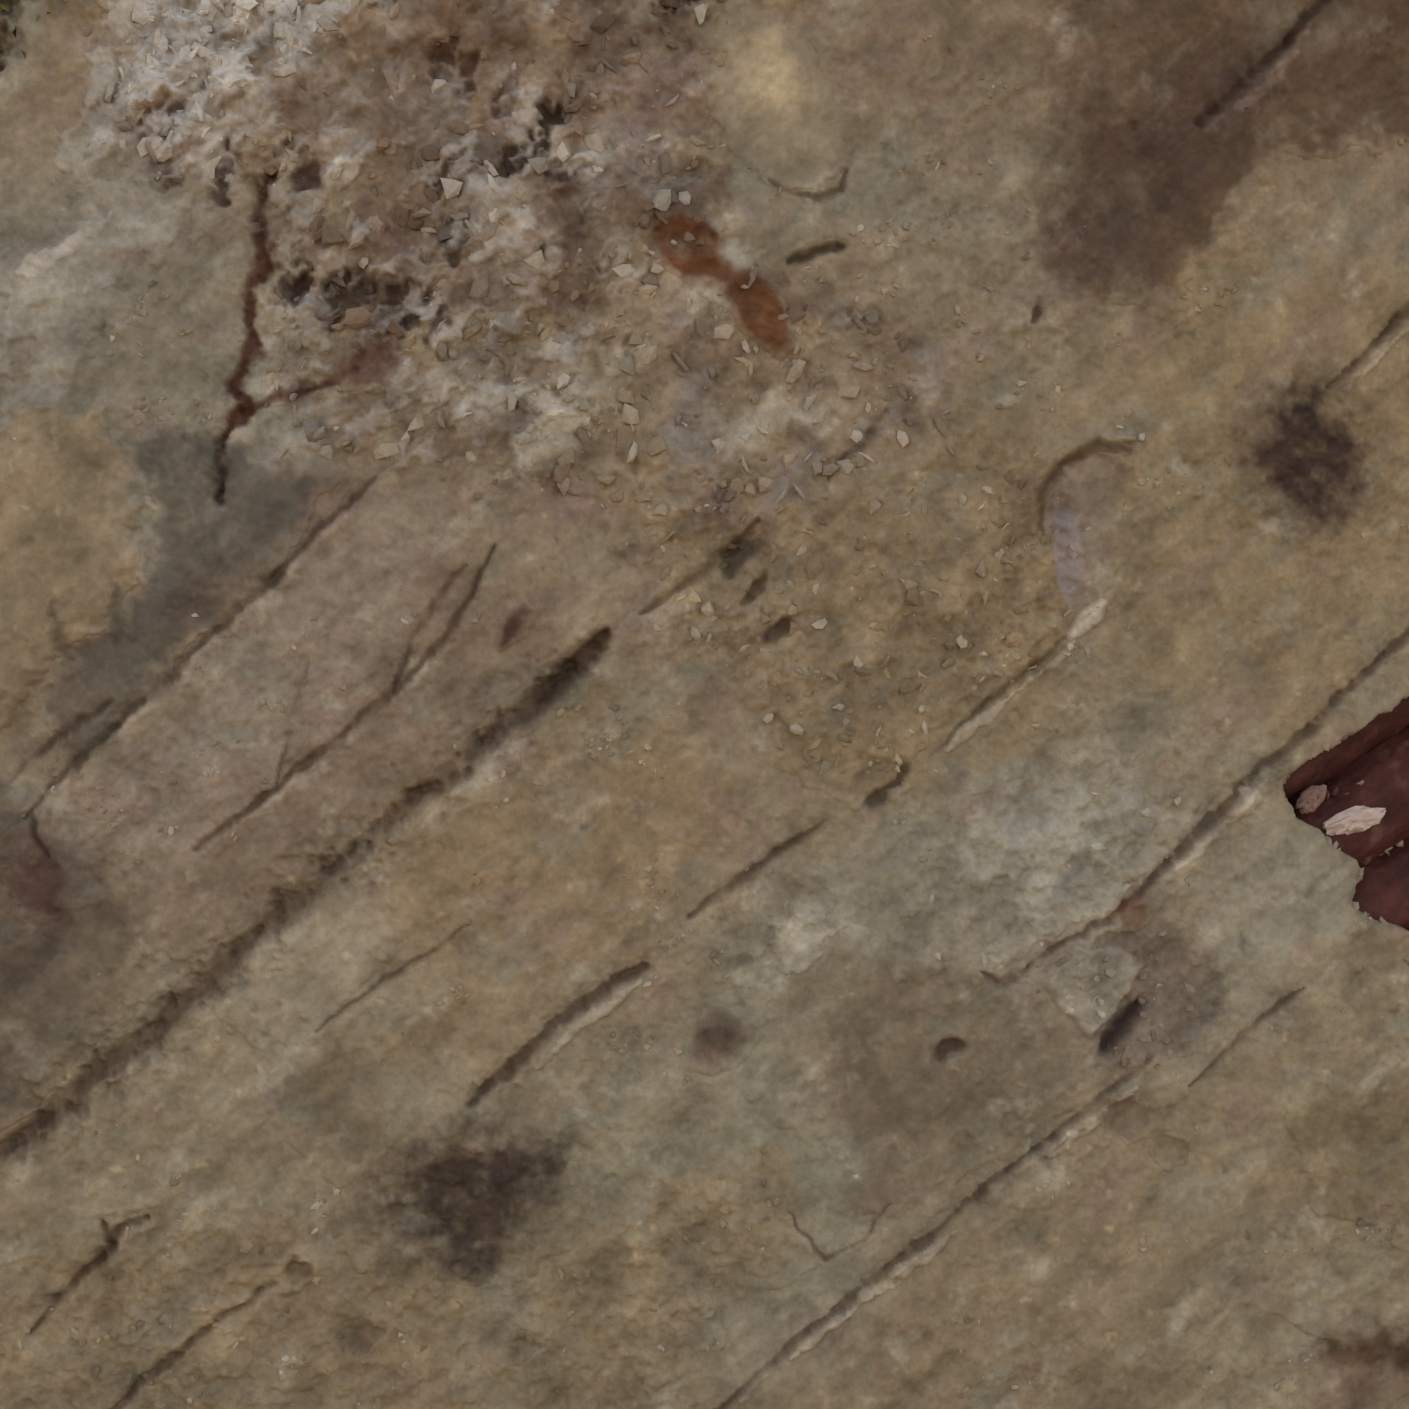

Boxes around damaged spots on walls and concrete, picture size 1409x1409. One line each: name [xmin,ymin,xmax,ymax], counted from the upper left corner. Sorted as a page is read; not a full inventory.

crack [216,140,335,439]
corrosion [615,191,798,362]
crack [825,408,889,482]
crack [122,472,380,730]
water stain [0,0,675,1132]
crack [928,614,1090,759]
crack [0,519,762,1183]
crack [685,814,835,921]
spalling [1282,773,1405,929]